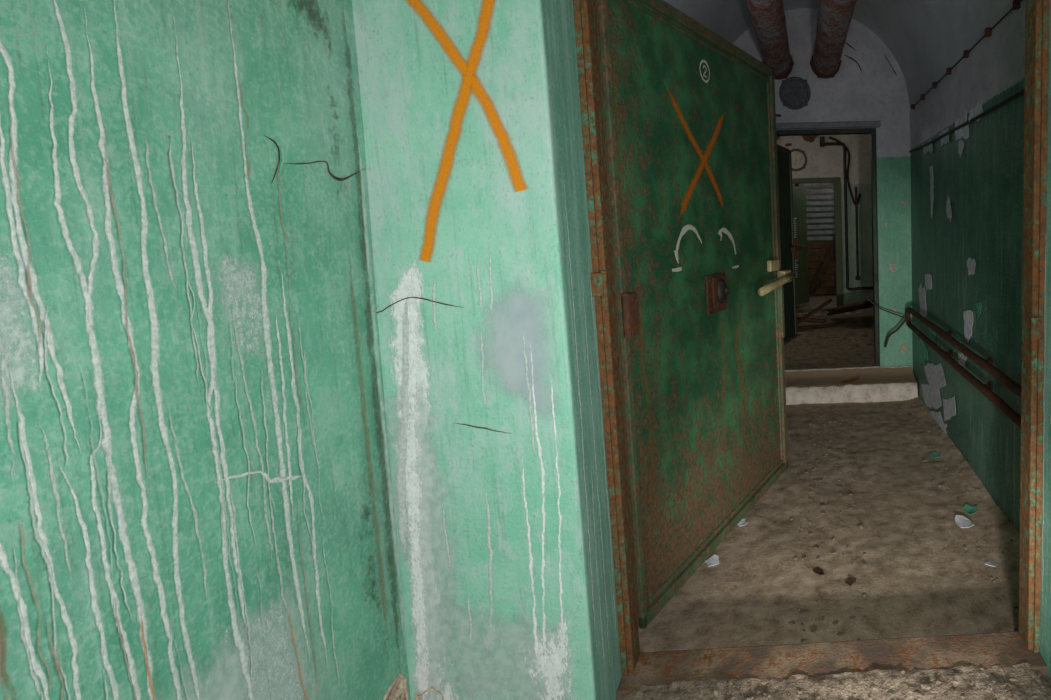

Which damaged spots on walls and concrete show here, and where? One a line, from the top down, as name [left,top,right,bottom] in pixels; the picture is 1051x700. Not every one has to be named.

crack [264,135,365,182]
water stain [362,191,371,276]
water stain [0,0,340,700]
water stain [371,252,575,700]
flaking render [383,674,444,700]